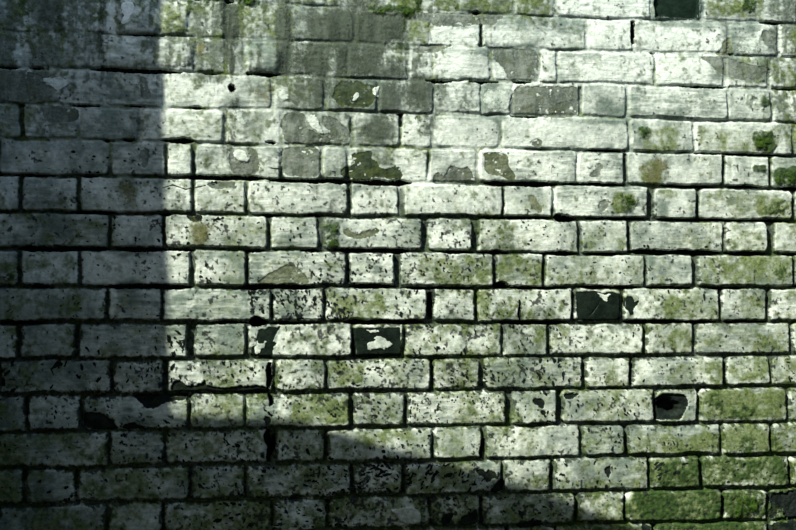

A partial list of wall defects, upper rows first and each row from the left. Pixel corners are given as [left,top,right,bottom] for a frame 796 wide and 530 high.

water stain [219,0,239,73]
water stain [275,0,436,139]
peeling [341,151,403,181]
peeling [483,152,515,180]
peeling [248,254,363,321]
peeling [343,228,380,239]
spalling [426,227,486,284]
flaking render [575,260,639,336]
spalling [133,310,281,409]
flaking render [304,324,445,418]
spalling [612,394,688,420]
spalling [763,459,796,530]